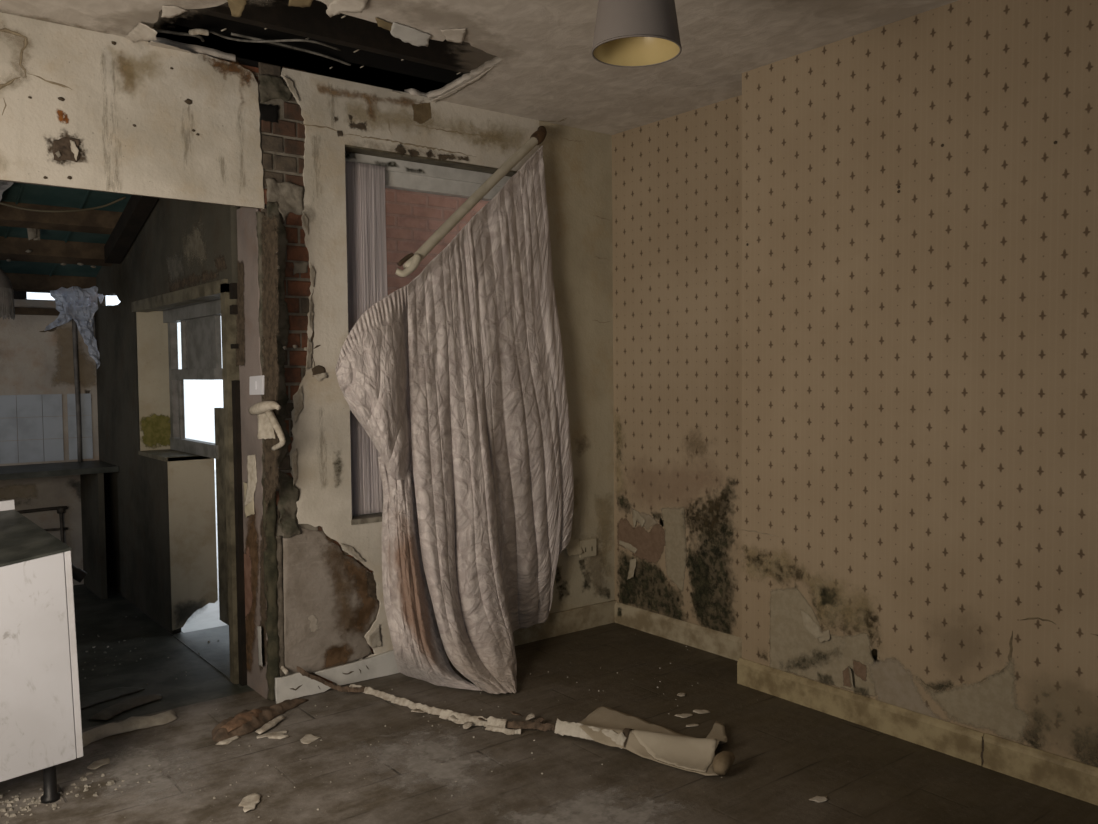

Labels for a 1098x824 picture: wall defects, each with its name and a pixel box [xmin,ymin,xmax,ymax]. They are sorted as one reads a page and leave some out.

spalling [47,132,86,164]
spalling [243,62,382,701]
peeling [619,540,637,580]
water stain [579,480,736,634]
water stain [747,553,877,638]
peeling [770,588,876,696]